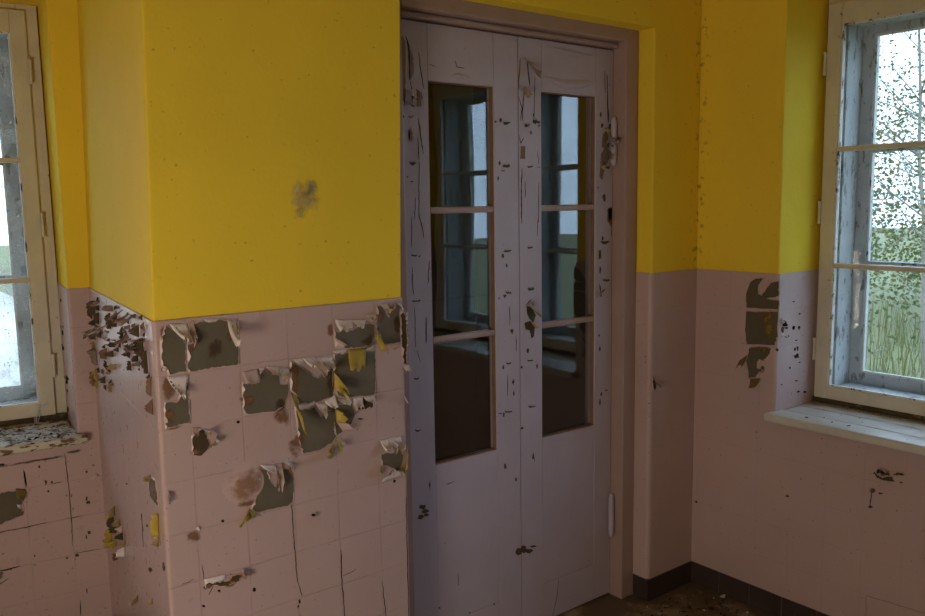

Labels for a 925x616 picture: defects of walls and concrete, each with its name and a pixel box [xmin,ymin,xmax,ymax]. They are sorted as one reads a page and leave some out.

peeling [736,277,801,389]
peeling [82,297,419,528]
peeling [0,487,31,525]
crack [53,453,98,553]
peeling [102,506,125,561]
peeling [142,474,170,547]
peeling [202,567,247,594]
crack [291,505,303,597]
crack [341,553,356,616]
crack [403,498,411,615]
peeling [868,469,903,508]